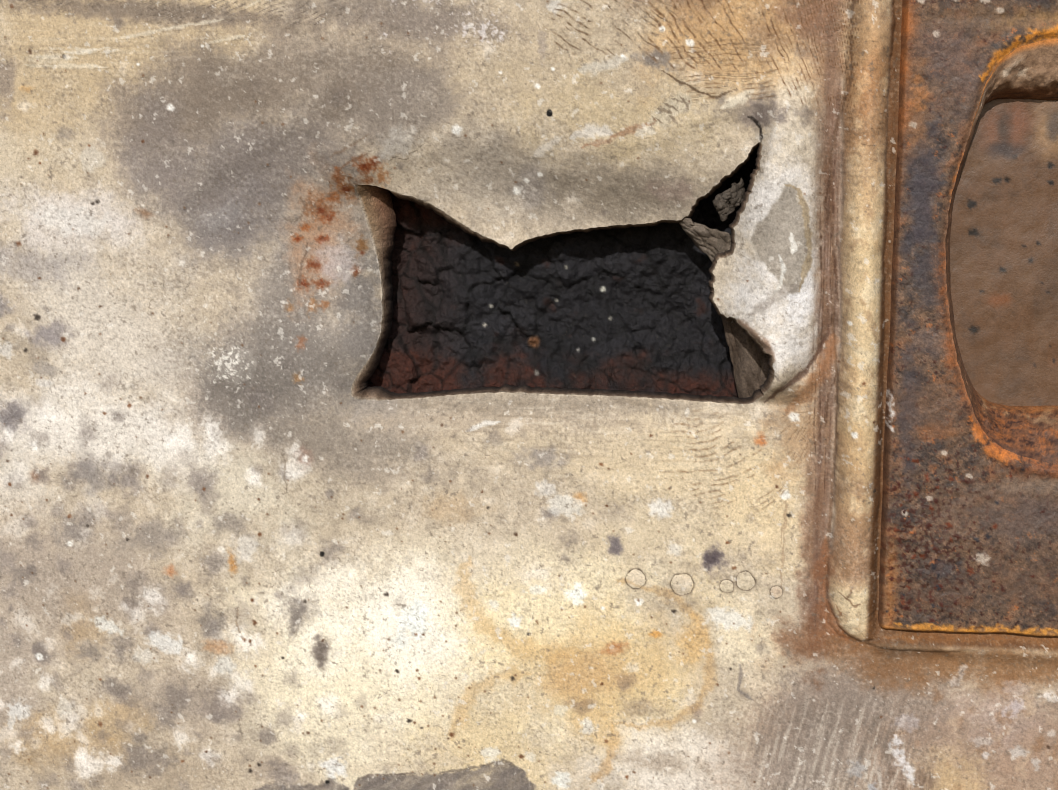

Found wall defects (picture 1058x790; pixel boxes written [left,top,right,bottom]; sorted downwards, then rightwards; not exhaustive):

corrosion [977,21,1058,84]
peeling [530,119,657,158]
peeling [719,90,756,111]
corrosion [905,73,933,113]
corrosion [1001,99,1040,147]
corrosion [266,140,397,354]
peeling [745,181,815,318]
corrosion [967,415,1025,472]
corrosion [873,455,1058,659]
damp [447,554,722,790]